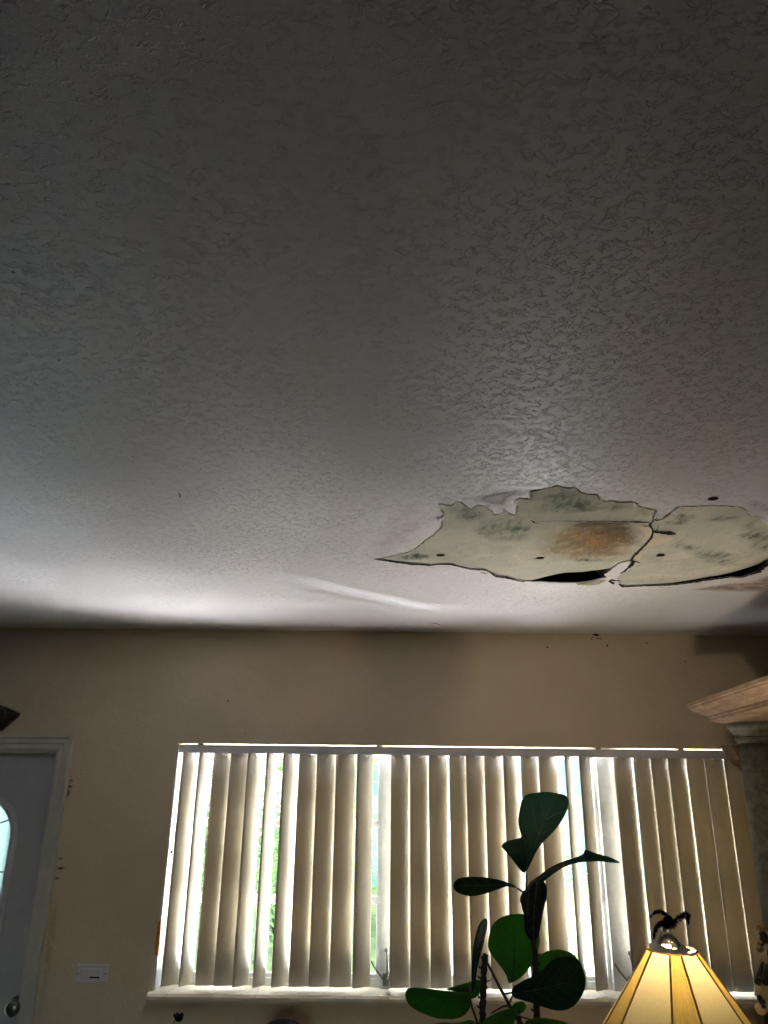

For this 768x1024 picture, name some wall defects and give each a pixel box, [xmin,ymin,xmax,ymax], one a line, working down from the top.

peeling [378,485,768,586]
crack [572,506,768,587]